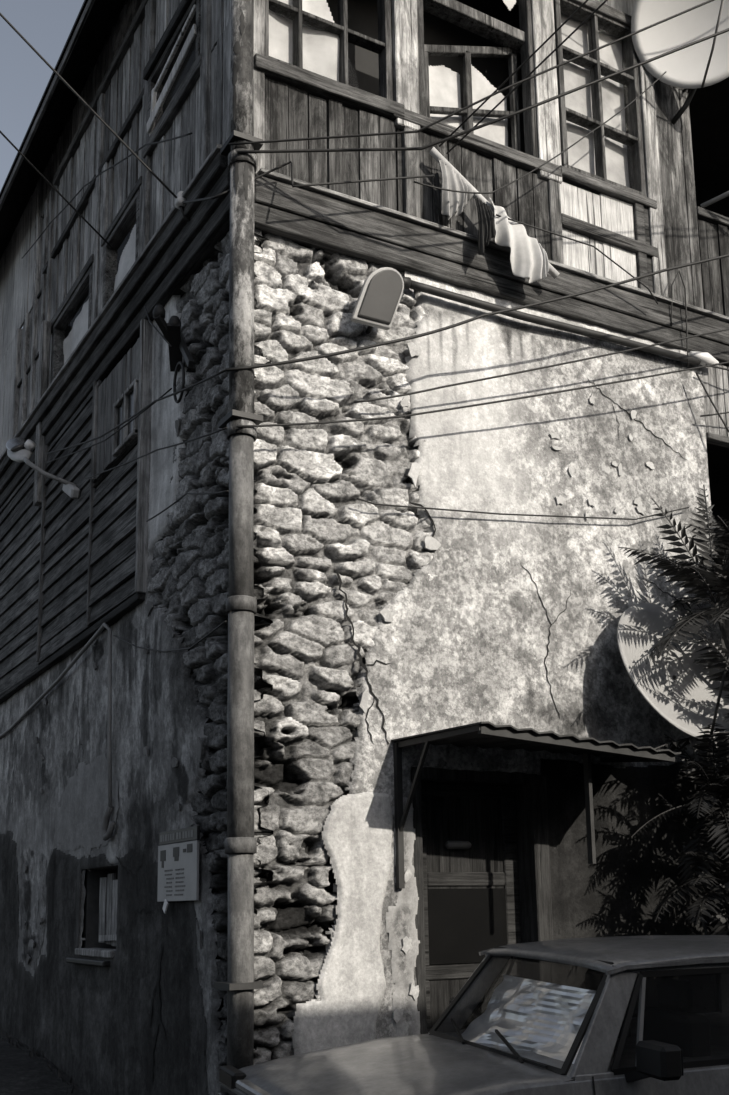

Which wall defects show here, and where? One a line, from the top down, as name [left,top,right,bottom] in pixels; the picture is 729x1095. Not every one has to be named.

peeling [407,342,422,357]
peeling [407,462,420,487]
peeling [424,536,441,550]
peeling [379,608,397,622]
crack [521,565,571,719]
peeling [359,689,368,714]
spalling [171,757,188,811]
peeling [385,797,420,1036]